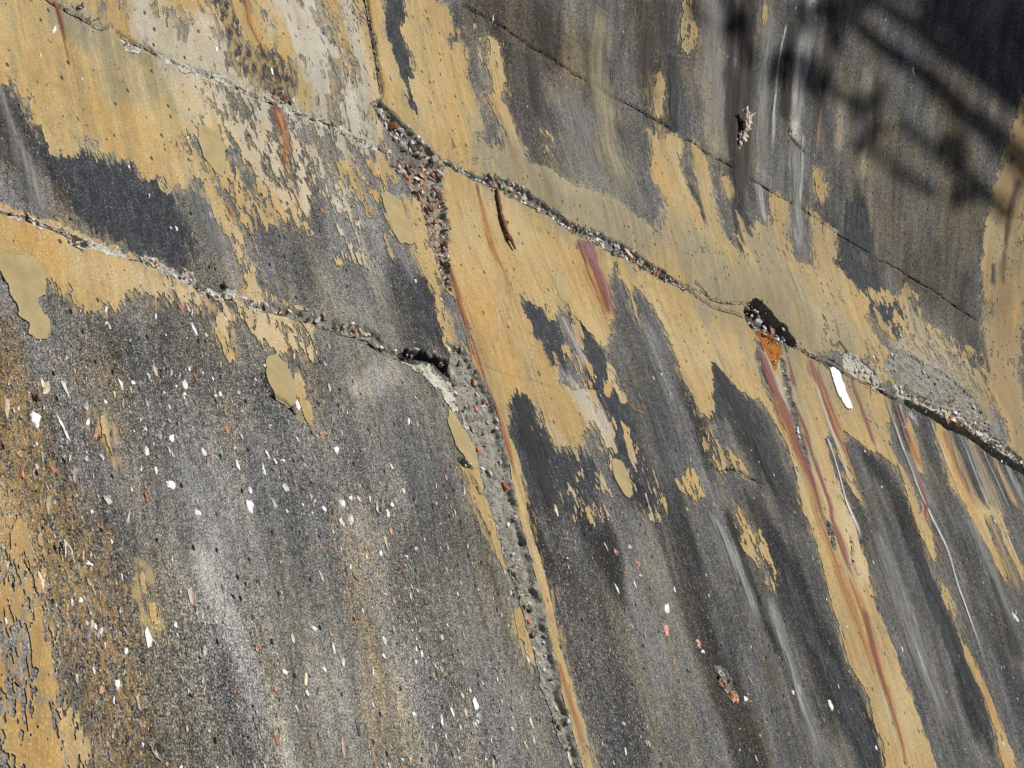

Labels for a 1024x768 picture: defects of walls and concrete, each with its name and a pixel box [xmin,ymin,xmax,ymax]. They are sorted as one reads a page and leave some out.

rust [53,1,70,57]
crack [45,0,176,65]
crack [364,2,380,87]
crack [462,6,975,320]
rust [579,240,615,311]
water stain [707,362,782,488]
peeling [0,442,308,768]
peeling [344,425,542,768]
peeling [732,504,777,595]
water stain [711,516,823,749]
water stain [904,522,994,737]
peeling [937,577,1024,768]